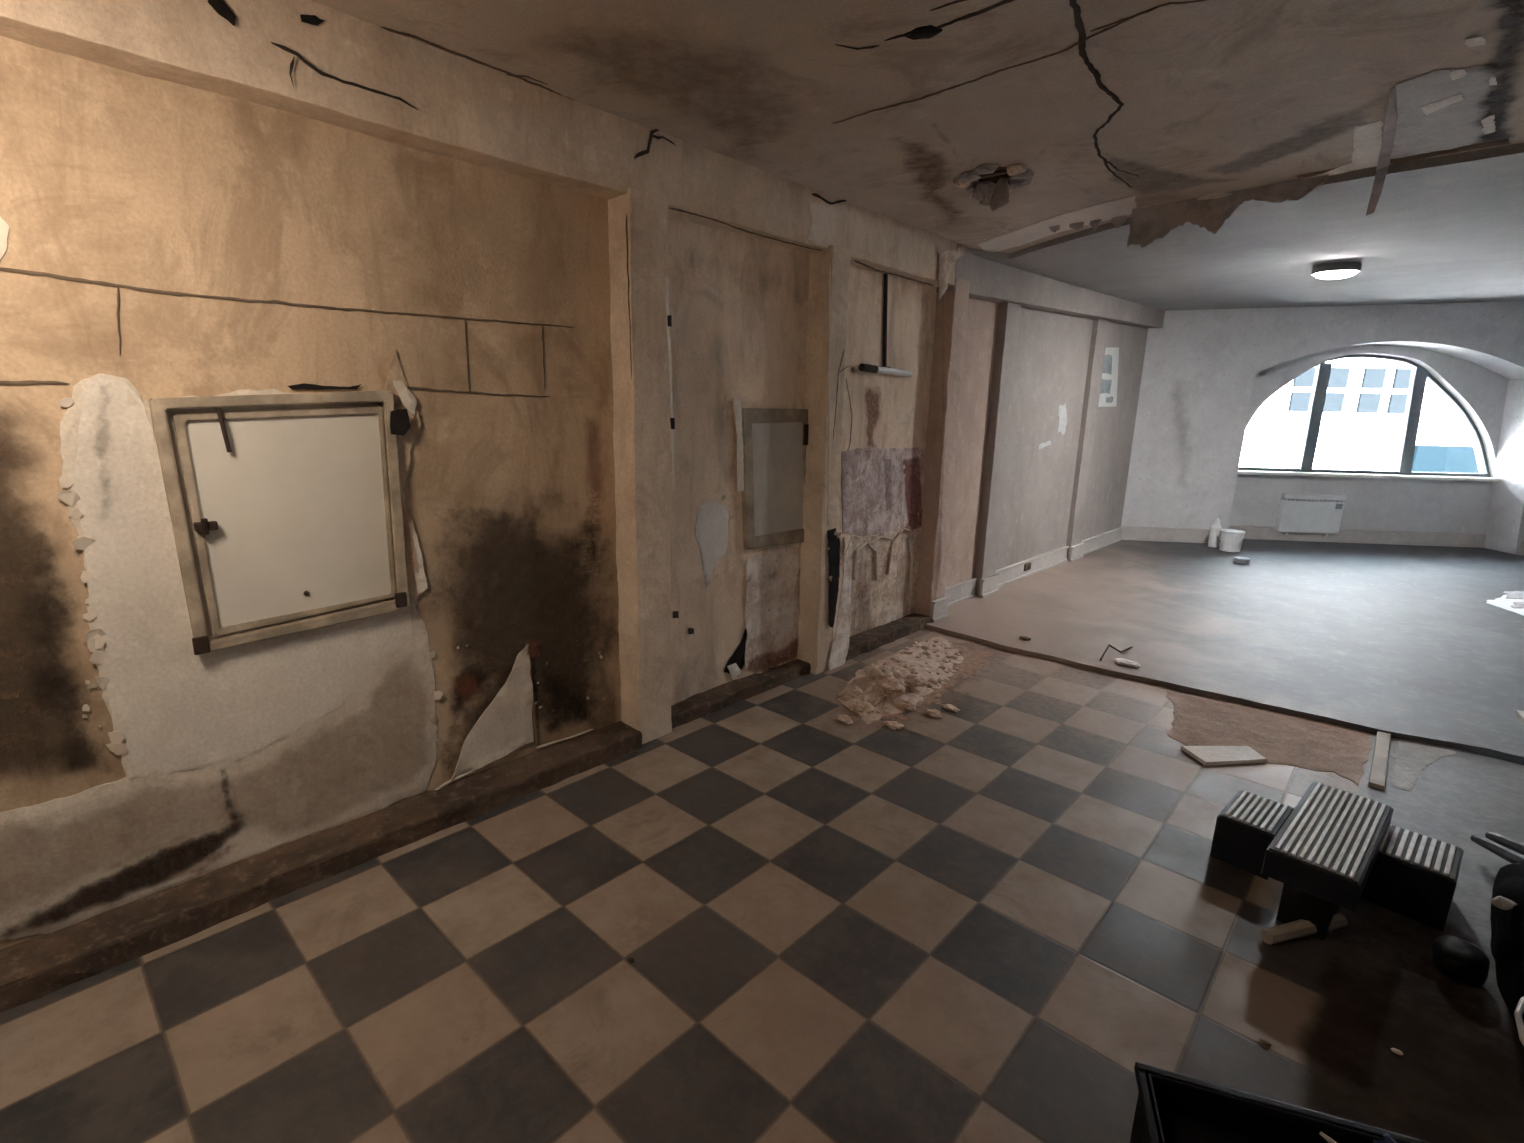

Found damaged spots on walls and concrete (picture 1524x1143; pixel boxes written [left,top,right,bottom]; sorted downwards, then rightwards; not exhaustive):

spalling [207,0,236,27]
spalling [300,14,324,26]
crack [271,42,418,110]
crack [831,0,1206,188]
crack [634,129,675,159]
leakage [0,429,101,775]
leakage [434,511,615,737]